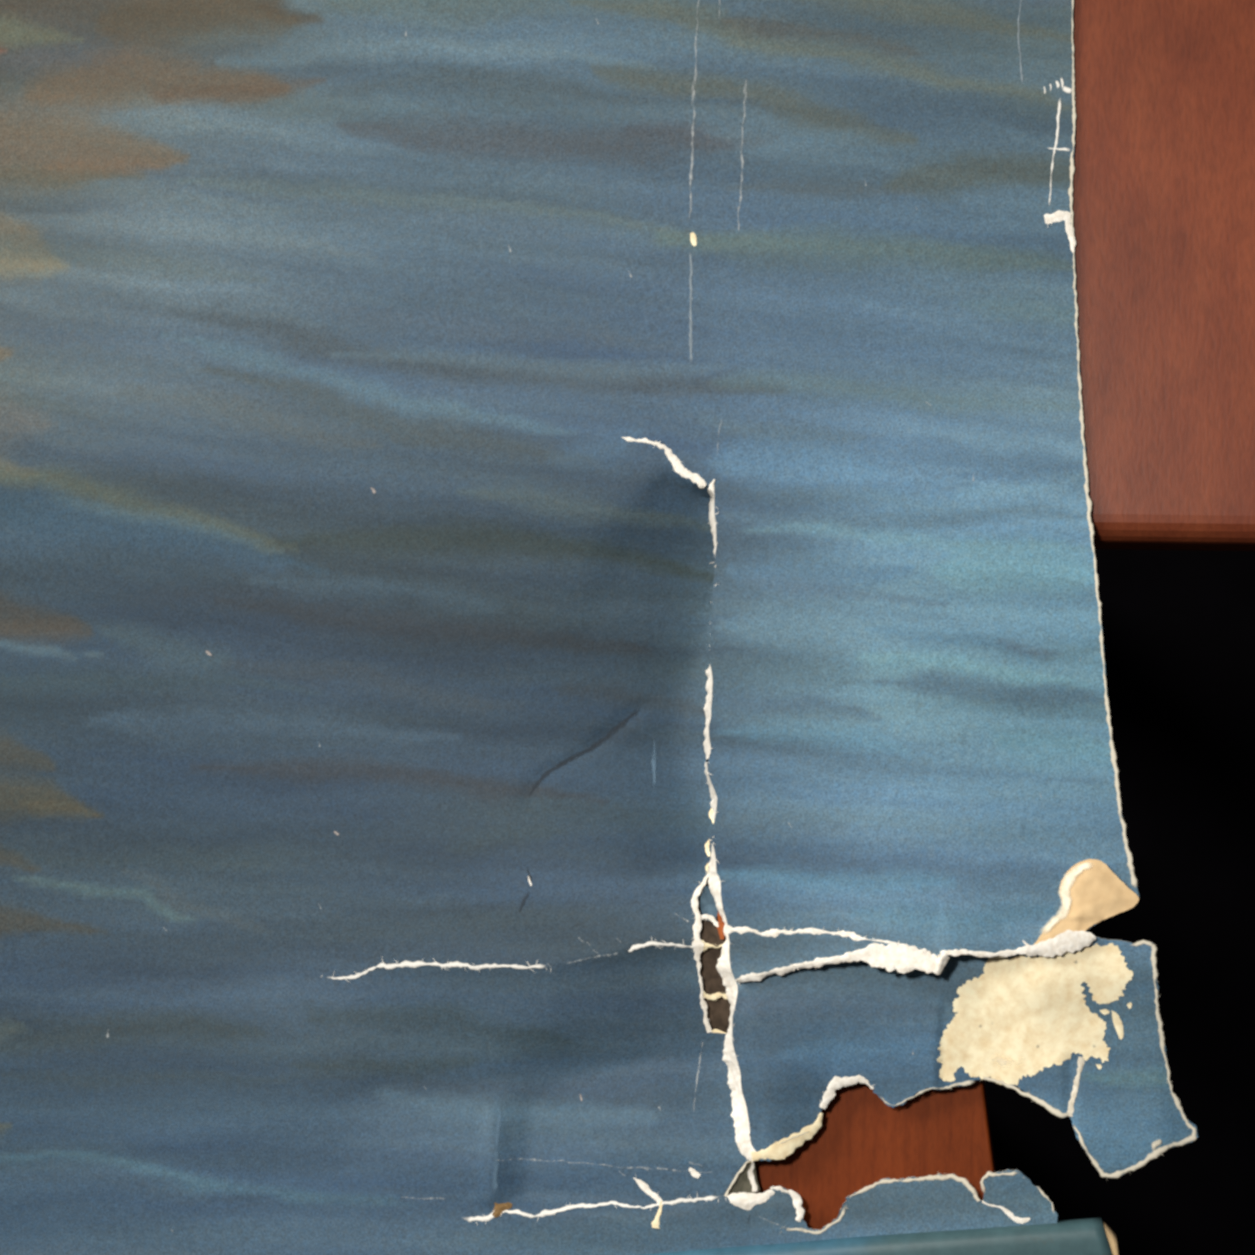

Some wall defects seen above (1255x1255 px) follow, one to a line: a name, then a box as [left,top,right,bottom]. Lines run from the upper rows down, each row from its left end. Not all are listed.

peeling [937,859,1139,1117]
peeling [727,1190,775,1210]